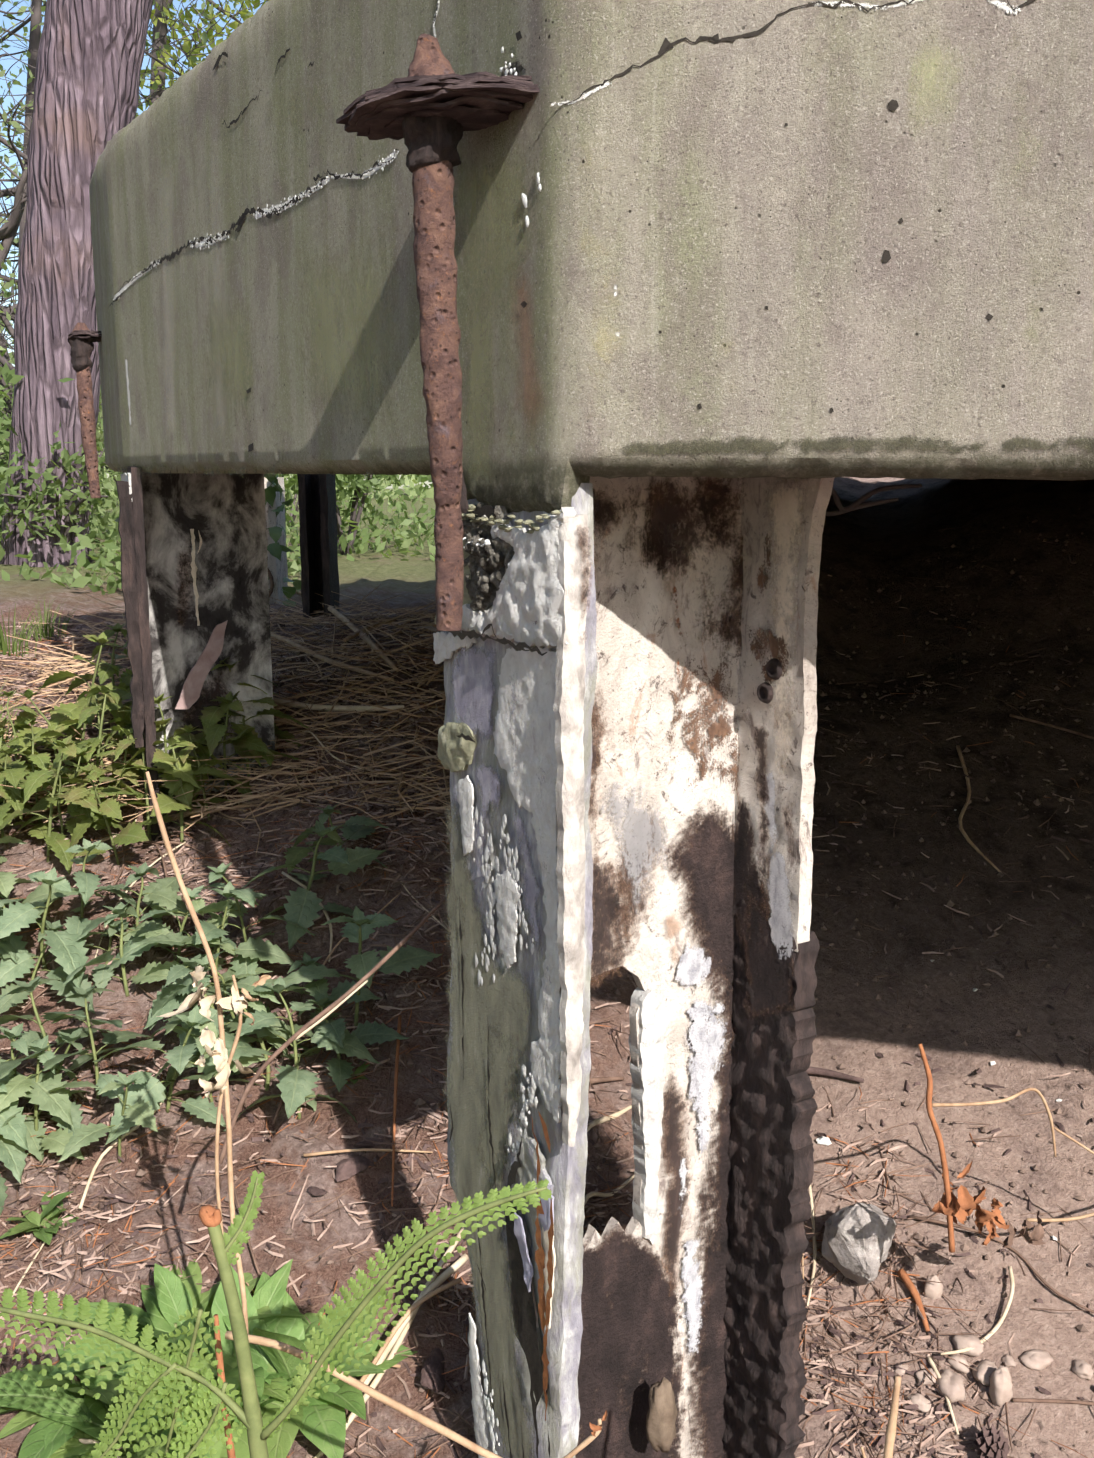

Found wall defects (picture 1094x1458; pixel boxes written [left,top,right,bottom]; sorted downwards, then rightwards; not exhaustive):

crack [549,0,924,106]
crack [988,0,1035,15]
crack [110,149,399,306]
peeling [433,632,477,664]
peeling [457,642,562,1329]